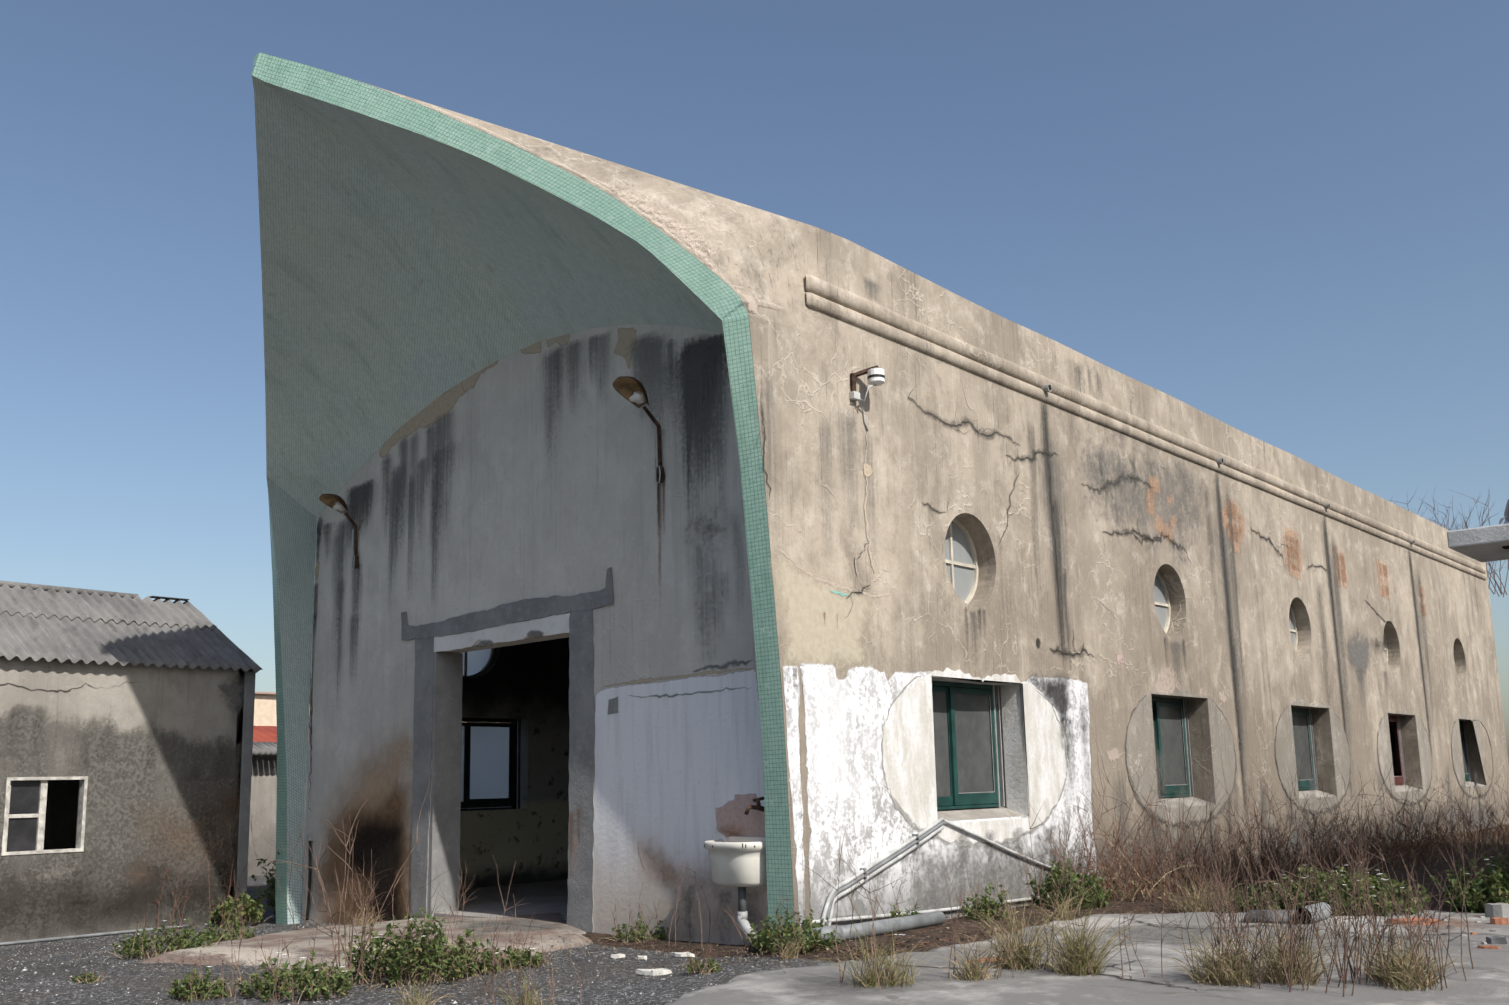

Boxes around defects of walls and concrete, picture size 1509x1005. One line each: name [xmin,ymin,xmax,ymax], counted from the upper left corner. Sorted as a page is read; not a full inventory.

crack [822,433,892,618]
crack [908,359,1057,538]
water stain [1029,406,1086,755]
crack [1082,469,1191,562]
water stain [0,706,241,939]
peeling [778,549,1119,930]